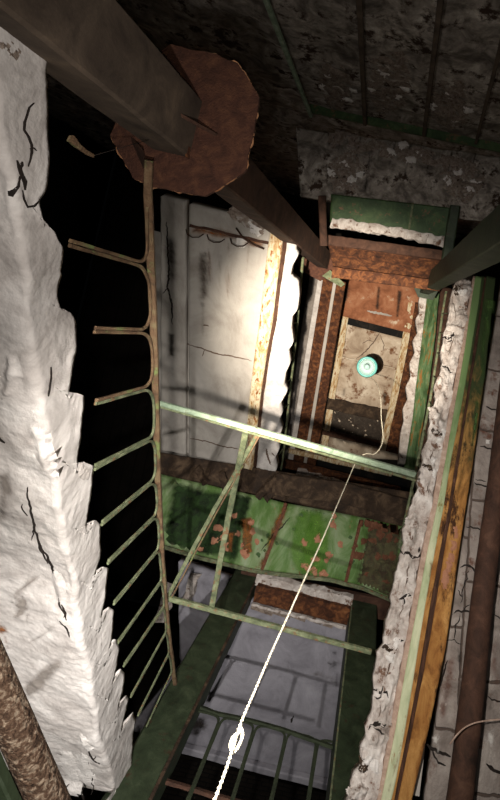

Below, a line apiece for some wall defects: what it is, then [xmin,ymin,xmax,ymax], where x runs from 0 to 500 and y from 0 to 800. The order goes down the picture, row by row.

crack [8,103,40,208]
crack [163,222,173,325]
crack [187,343,250,361]
crack [21,487,54,573]
corrosion [242,518,252,554]
peeling [301,519,399,577]
corrosion [358,523,401,596]
crack [58,598,70,638]
crack [447,564,475,644]
flaking render [382,637,402,663]
flaking render [358,754,381,775]
crack [486,763,500,774]